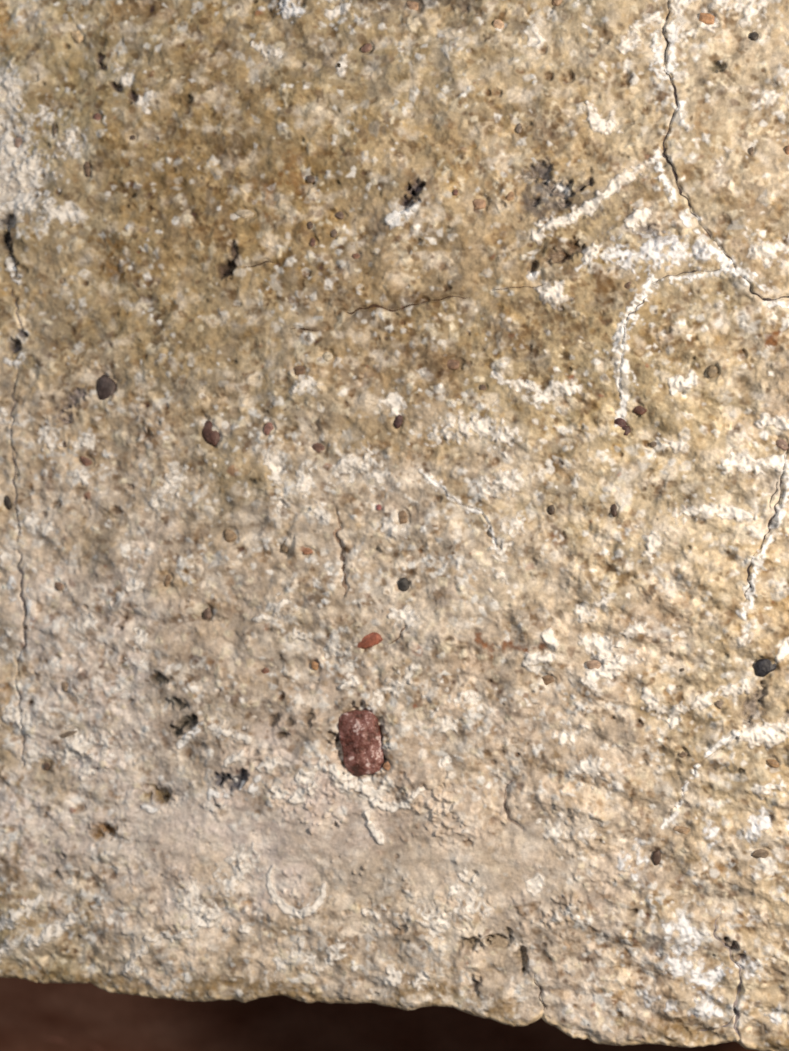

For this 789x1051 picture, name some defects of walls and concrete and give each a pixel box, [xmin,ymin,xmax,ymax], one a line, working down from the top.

crack [607,7,789,427]
crack [339,296,465,314]
crack [736,449,789,620]